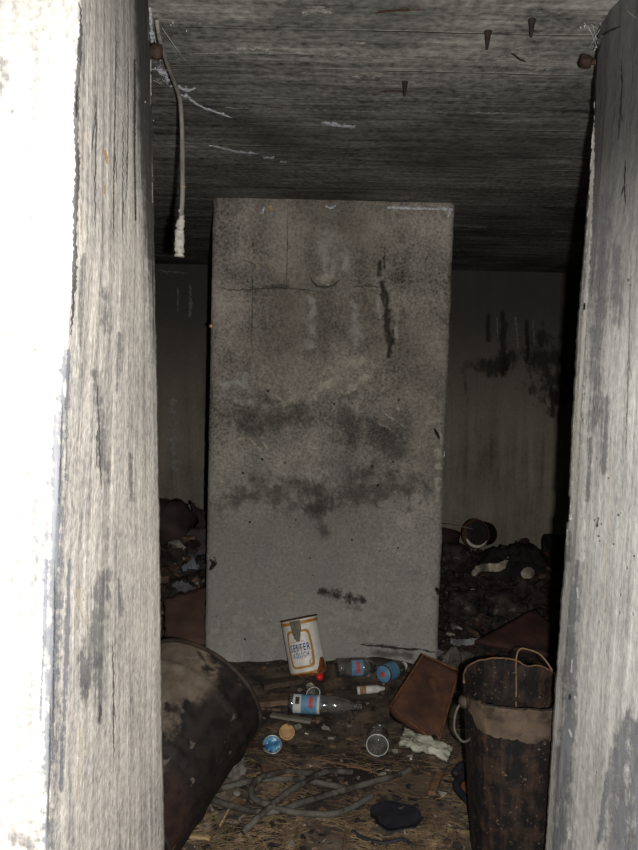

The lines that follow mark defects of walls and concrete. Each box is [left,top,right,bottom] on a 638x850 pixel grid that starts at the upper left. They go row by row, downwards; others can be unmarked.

damp [377,257,398,358]
damp [479,312,534,377]